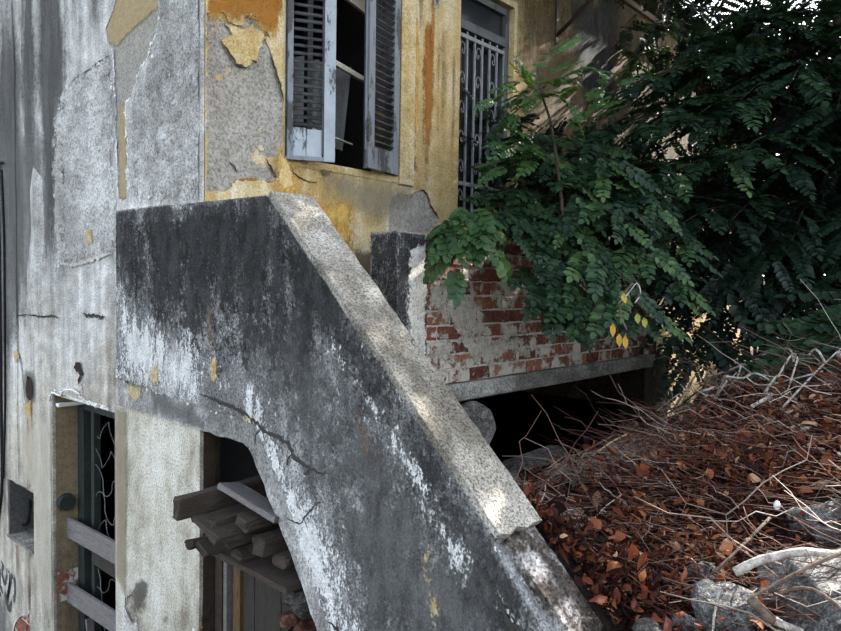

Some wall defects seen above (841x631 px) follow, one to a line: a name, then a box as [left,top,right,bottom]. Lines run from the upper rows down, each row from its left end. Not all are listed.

damp [0,0,63,351]
flaking render [50,0,294,273]
flaking render [388,189,438,233]
rust [415,0,455,164]
flaking render [406,244,532,368]
crack [199,394,330,475]
damp [115,195,536,631]
flaking render [13,614,30,631]
flaking render [121,601,139,631]